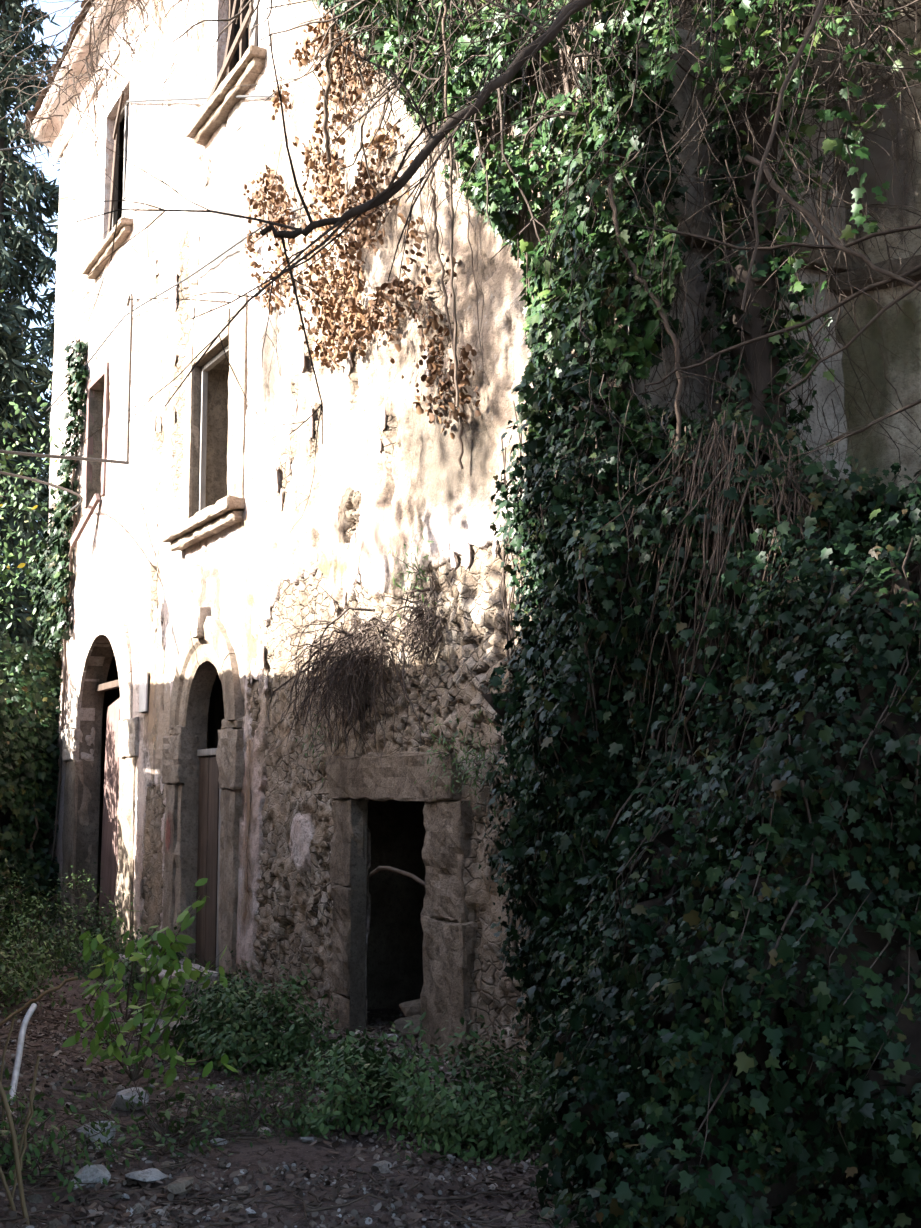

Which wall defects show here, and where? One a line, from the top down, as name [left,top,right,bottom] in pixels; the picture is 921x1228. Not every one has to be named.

spalling [344,491,366,557]
spalling [247,538,545,1087]